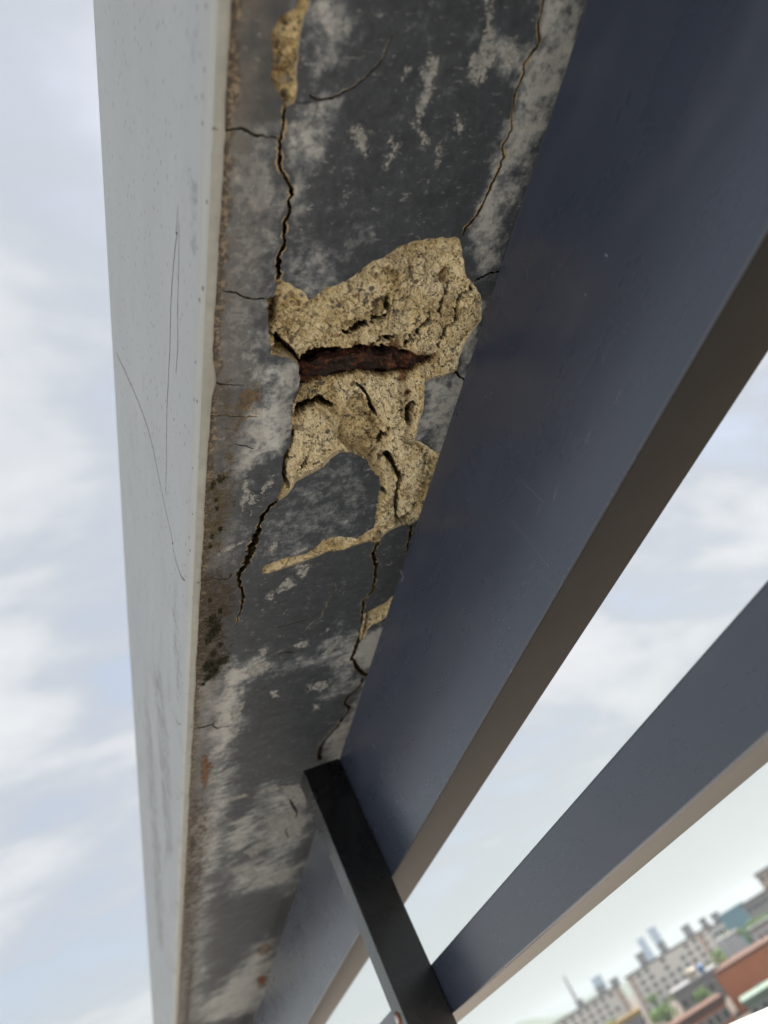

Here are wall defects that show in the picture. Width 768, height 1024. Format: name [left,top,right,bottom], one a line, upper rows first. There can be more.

spalling [270,0,310,109]
crack [212,34,393,300]
crack [462,0,545,238]
crack [167,208,179,398]
crack [116,353,277,625]
spalling [239,237,482,600]
crack [316,531,382,761]